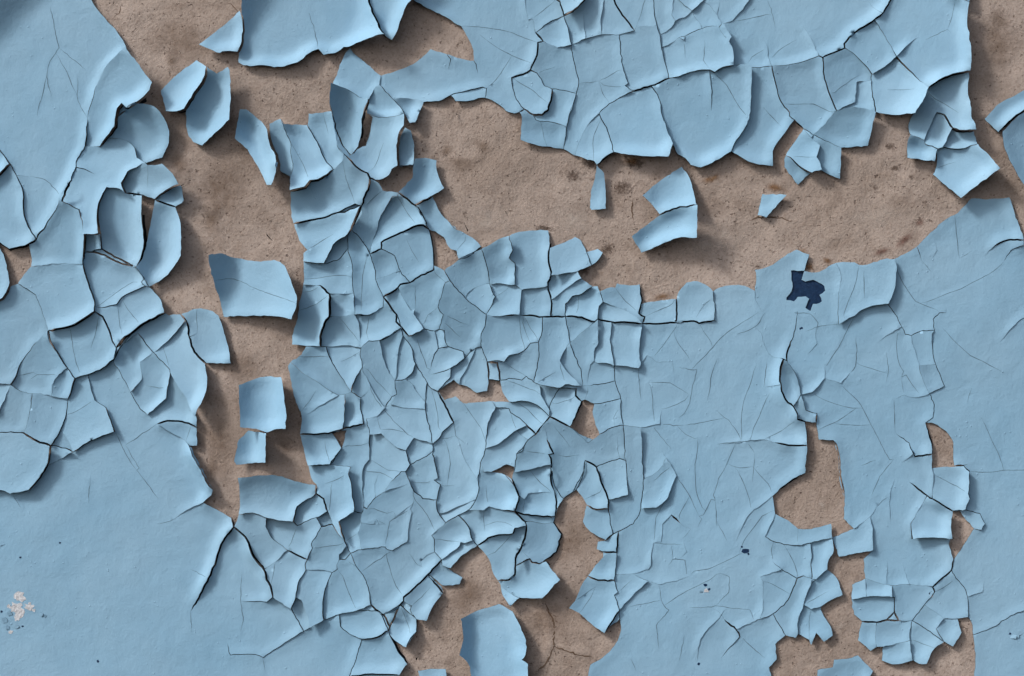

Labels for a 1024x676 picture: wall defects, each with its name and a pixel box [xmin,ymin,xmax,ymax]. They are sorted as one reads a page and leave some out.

crack [0,8,206,509]
peeling [0,0,676,676]
crack [368,0,385,36]
crack [190,83,1024,676]
peeling [272,0,1024,522]
crack [448,0,973,173]
peeling [760,360,1024,676]